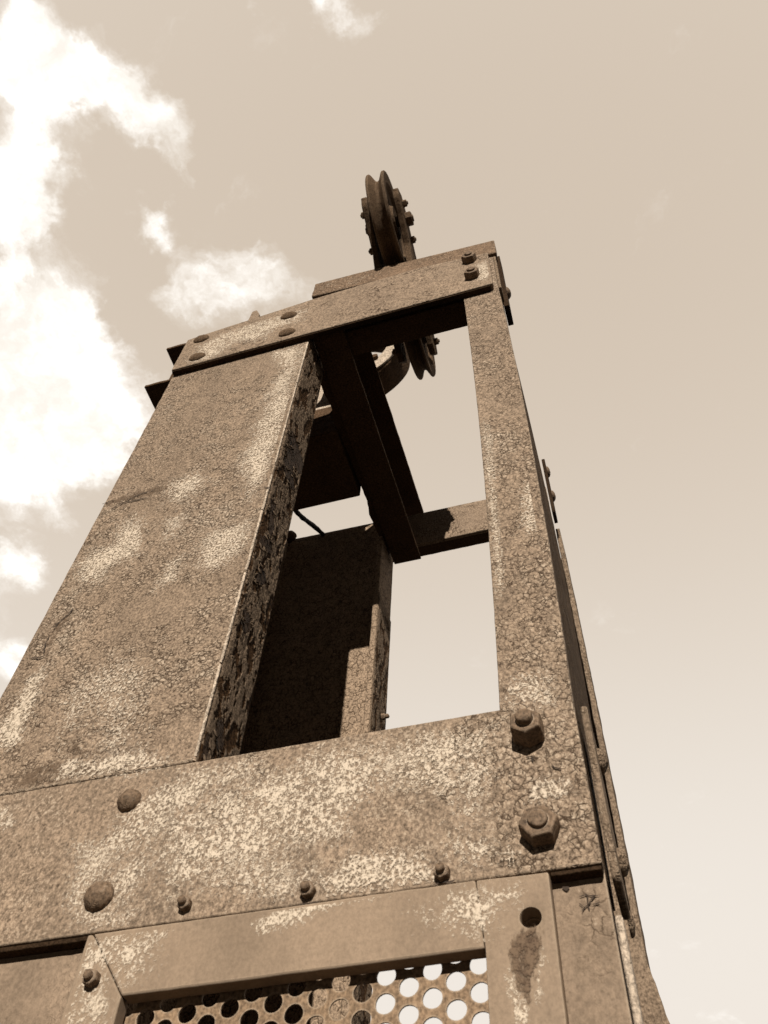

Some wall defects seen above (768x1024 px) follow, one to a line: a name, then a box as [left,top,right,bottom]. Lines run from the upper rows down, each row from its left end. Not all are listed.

peeling [56,342,522,1024]